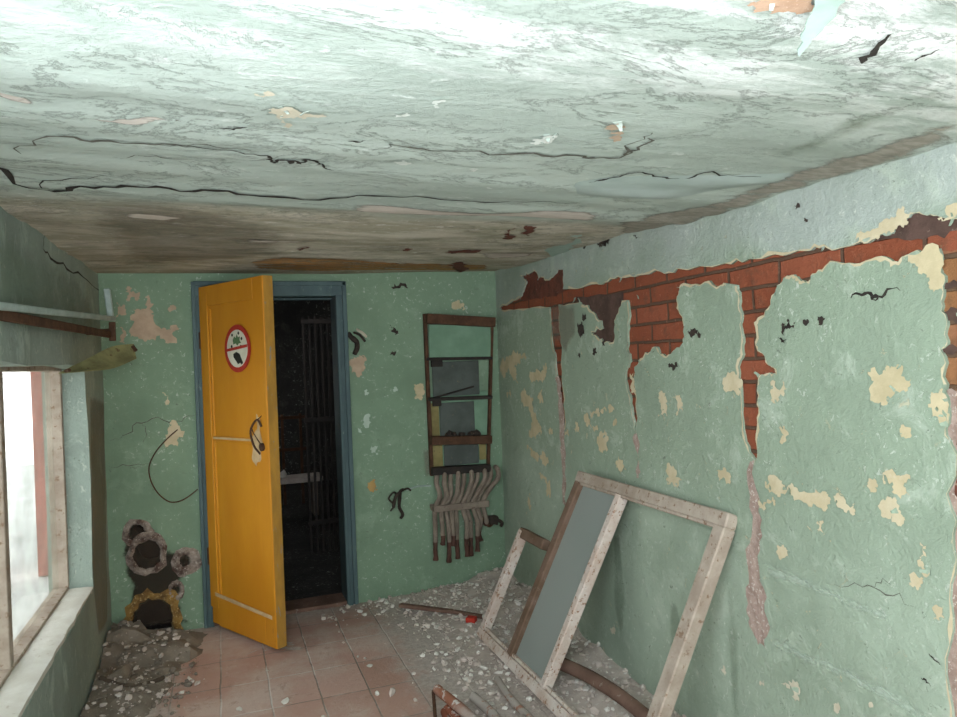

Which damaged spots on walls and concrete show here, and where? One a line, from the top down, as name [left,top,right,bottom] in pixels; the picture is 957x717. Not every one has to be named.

peeling [747,0,845,56]
crack [0,127,569,204]
peeling [116,286,179,343]
spalling [499,203,957,717]